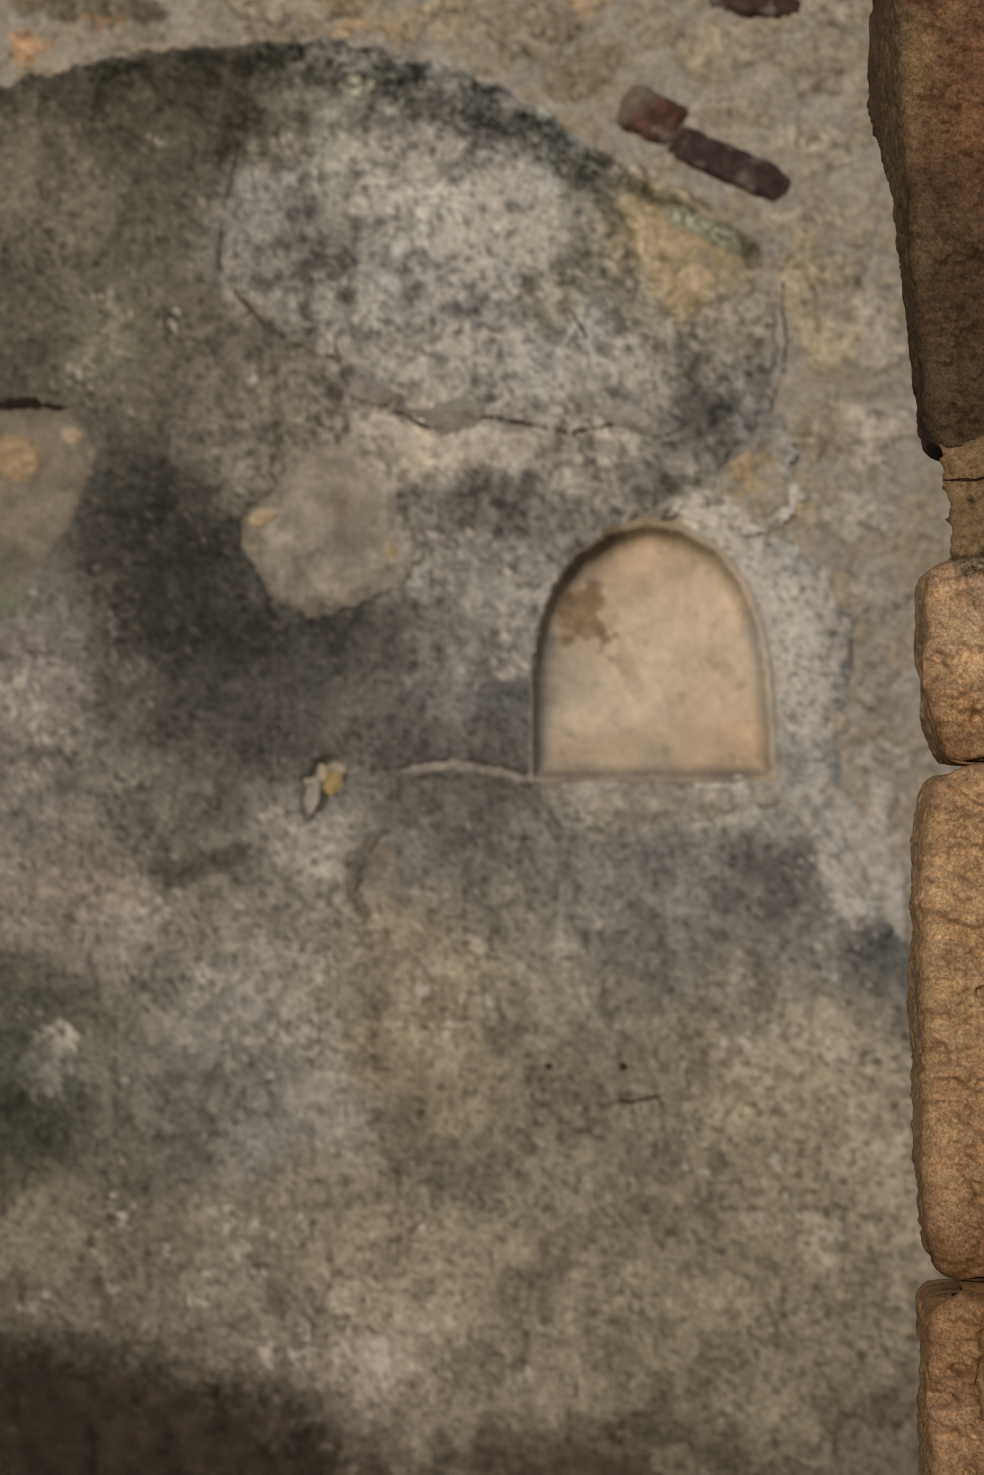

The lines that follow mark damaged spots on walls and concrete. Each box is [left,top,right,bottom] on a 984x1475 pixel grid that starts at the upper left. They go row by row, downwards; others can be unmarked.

crack [212,98,335,359]
spalling [609,164,759,305]
flaking render [333,333,683,438]
crack [562,307,592,362]
spalling [0,396,97,615]
spalling [240,440,424,618]
spalling [630,410,807,553]
spalling [303,757,348,821]
damp [0,1336,349,1475]